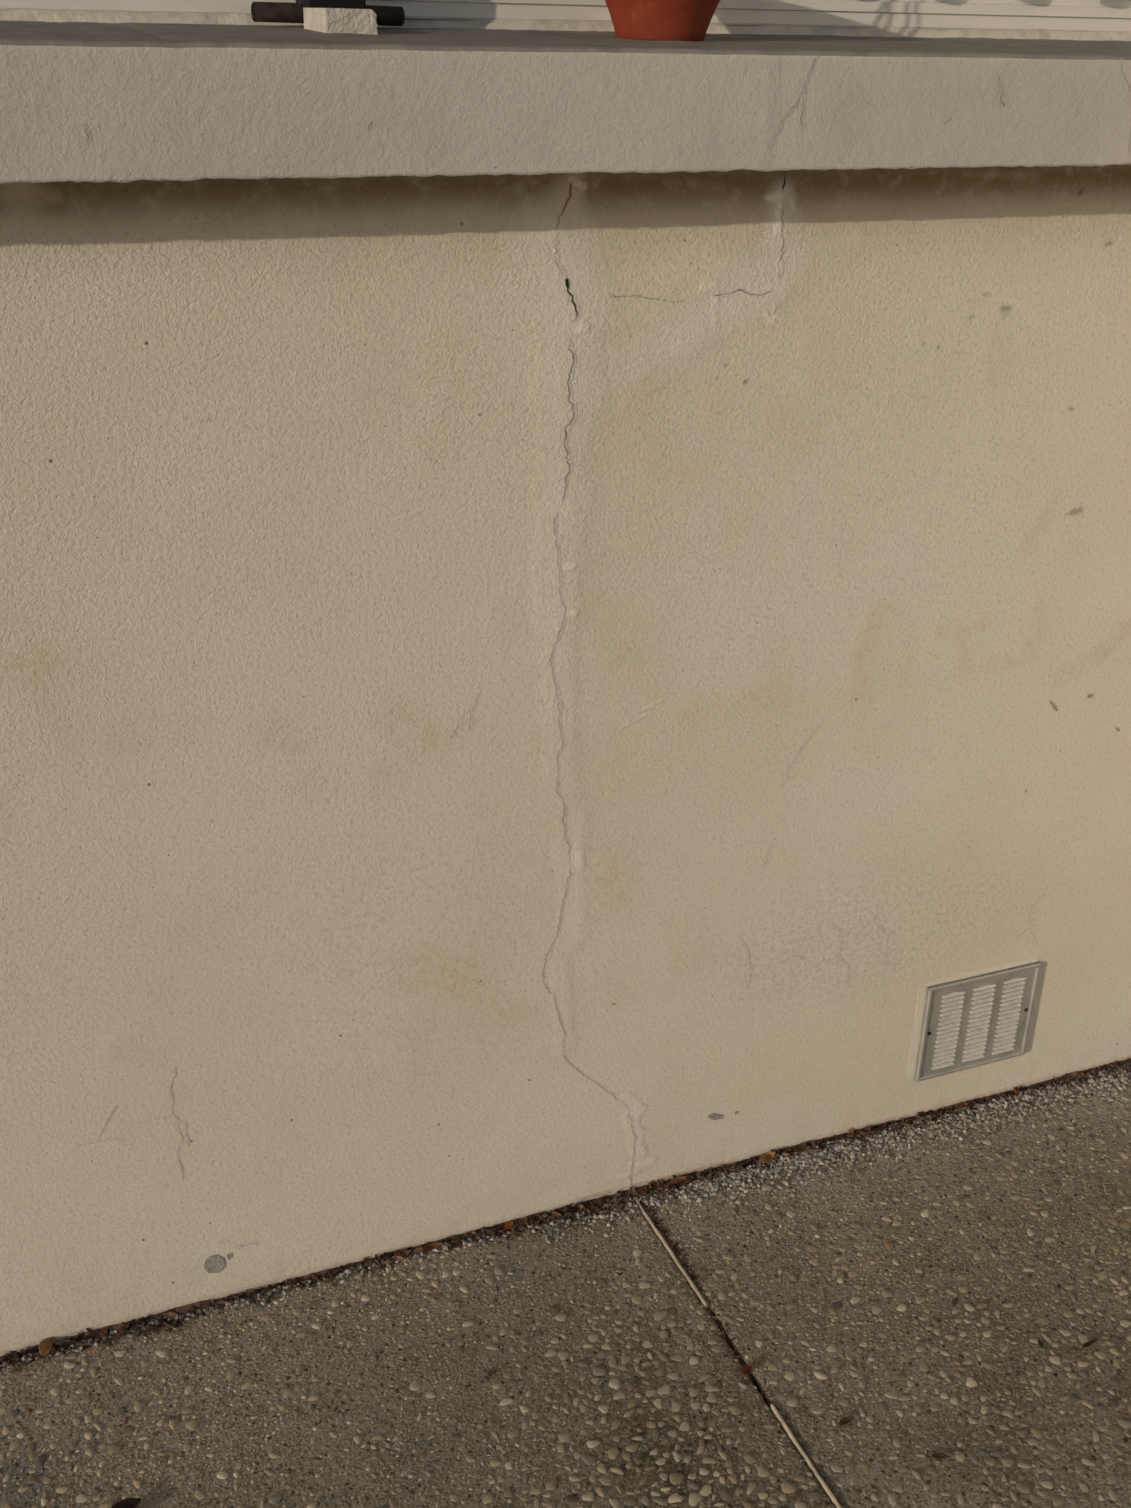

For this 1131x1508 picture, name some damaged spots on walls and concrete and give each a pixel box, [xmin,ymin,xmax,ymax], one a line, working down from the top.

crack [494,55,866,1187]